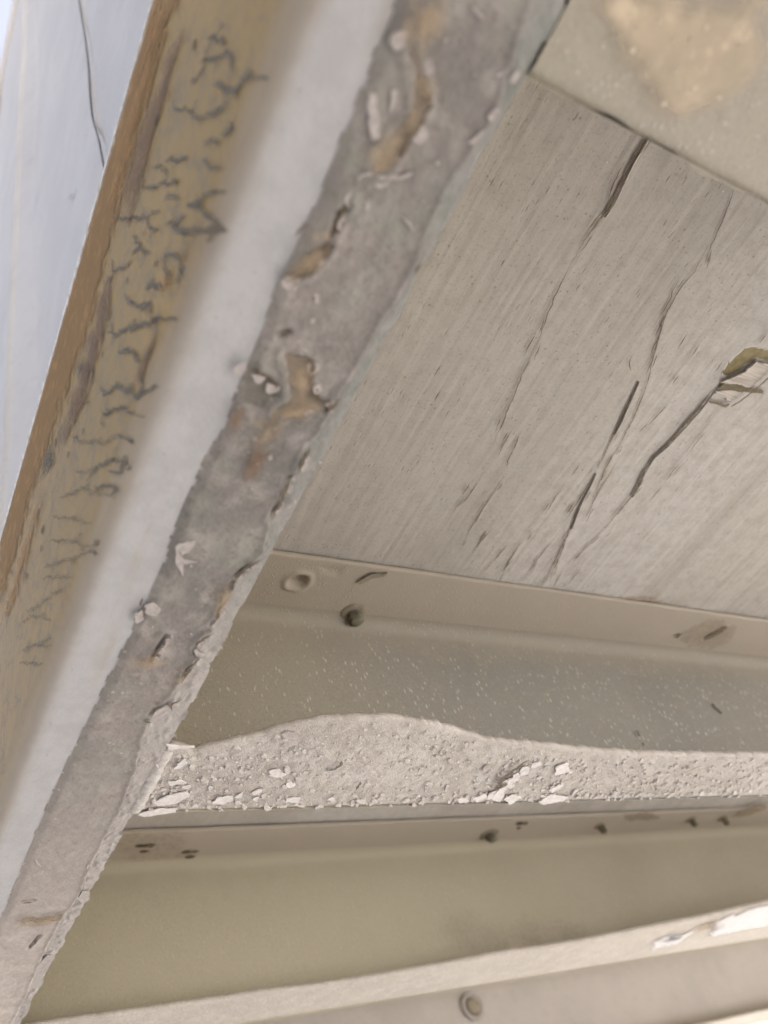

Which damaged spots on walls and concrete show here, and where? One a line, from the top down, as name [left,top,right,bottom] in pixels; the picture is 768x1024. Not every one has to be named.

peeling [390,30,408,52]
peeling [358,59,446,188]
peeling [468,109,500,145]
peeling [280,192,352,300]
peeling [233,362,289,394]
peeling [282,346,339,416]
crack [456,140,768,587]
peeling [175,541,206,576]
peeling [356,572,387,585]
peeling [134,603,161,628]
peeling [138,723,768,817]